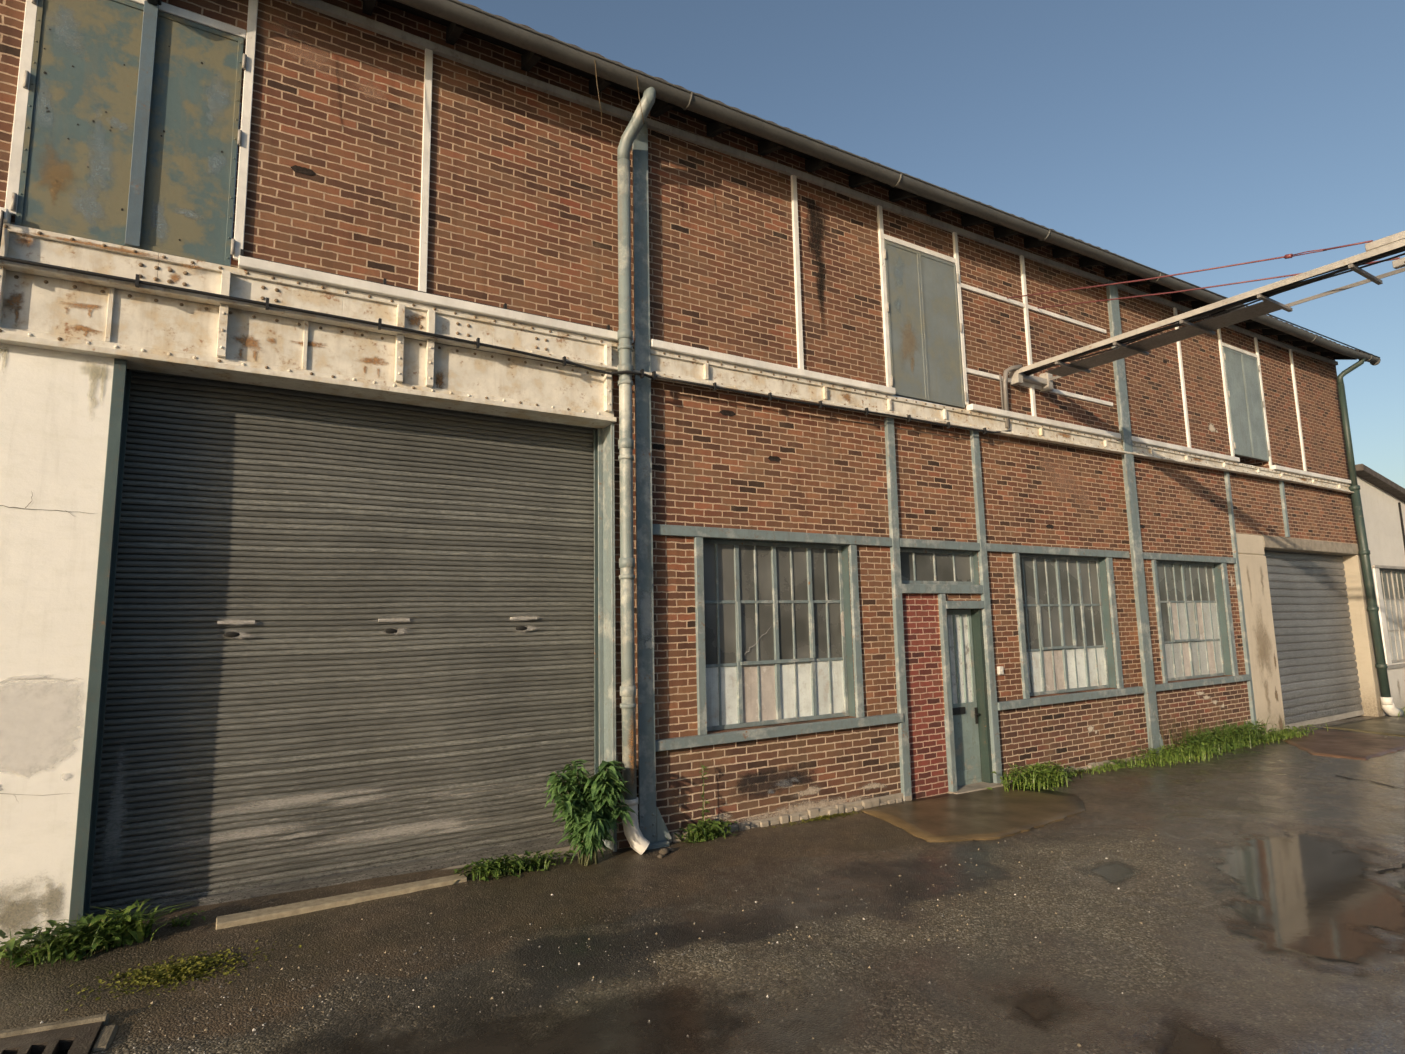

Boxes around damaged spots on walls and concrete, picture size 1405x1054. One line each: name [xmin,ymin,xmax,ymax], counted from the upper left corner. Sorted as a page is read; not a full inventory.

corrosion [15,233,146,256]
water stain [811,206,824,312]
corrosion [6,294,22,322]
corrosion [65,304,99,336]
corrosion [236,336,275,359]
corrosion [363,357,384,375]
crack [0,491,97,514]
crack [1376,863,1405,873]
water stain [0,884,61,932]